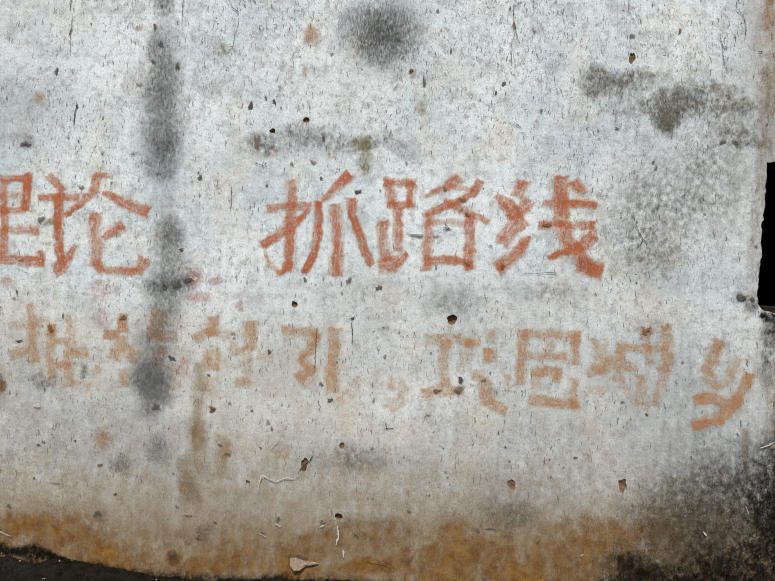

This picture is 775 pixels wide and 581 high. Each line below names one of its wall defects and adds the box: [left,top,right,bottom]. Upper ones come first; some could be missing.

damp [144,39,178,179]
damp [583,66,654,100]
damp [633,84,763,146]
damp [133,229,188,412]
damp [760,311,775,363]
damp [0,437,775,581]